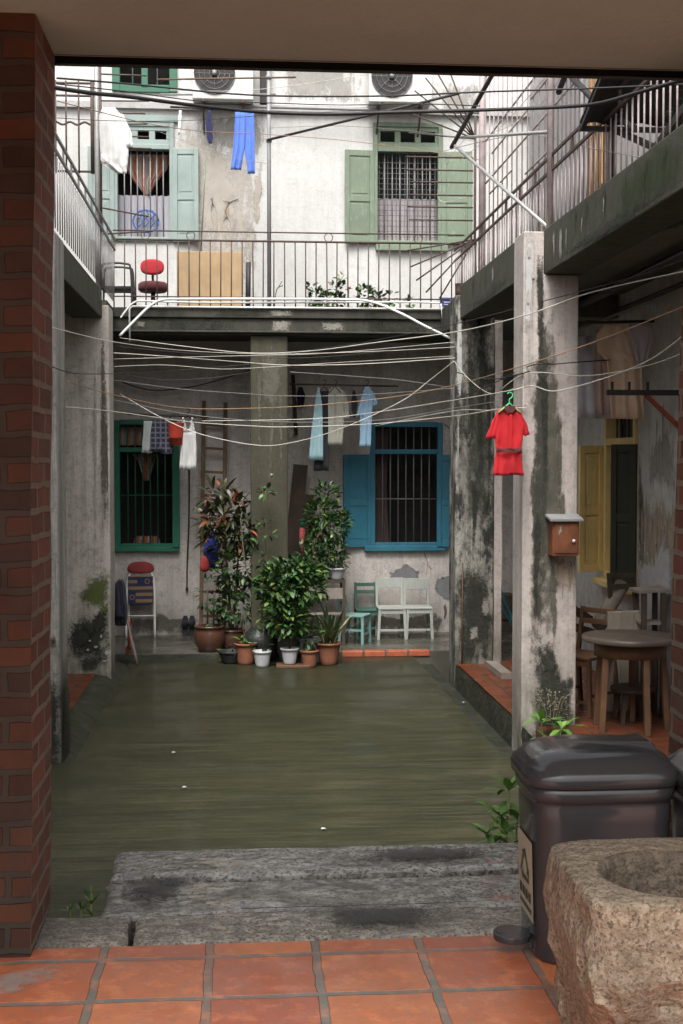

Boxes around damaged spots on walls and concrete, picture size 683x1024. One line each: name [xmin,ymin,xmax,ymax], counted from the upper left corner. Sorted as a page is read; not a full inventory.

water stain [530,186,669,732]
water stain [351,339,492,664]
flaking render [389,564,420,578]
flaking render [436,576,449,599]
mould [69,610,110,670]